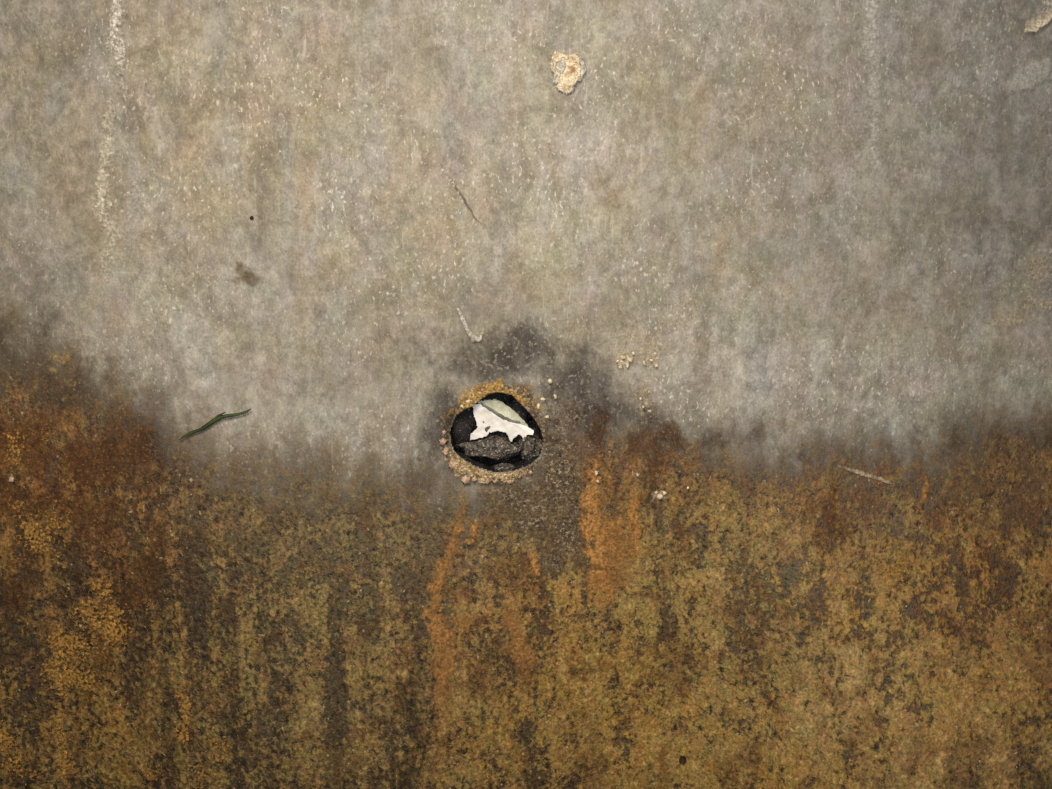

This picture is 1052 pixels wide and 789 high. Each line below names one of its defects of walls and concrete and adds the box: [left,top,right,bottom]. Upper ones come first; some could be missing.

spalling [550,51,586,95]
corrosion [422,503,479,697]
spalling [438,378,584,571]
corrosion [503,596,536,689]
water stain [0,323,1052,789]
corrosion [579,459,648,610]